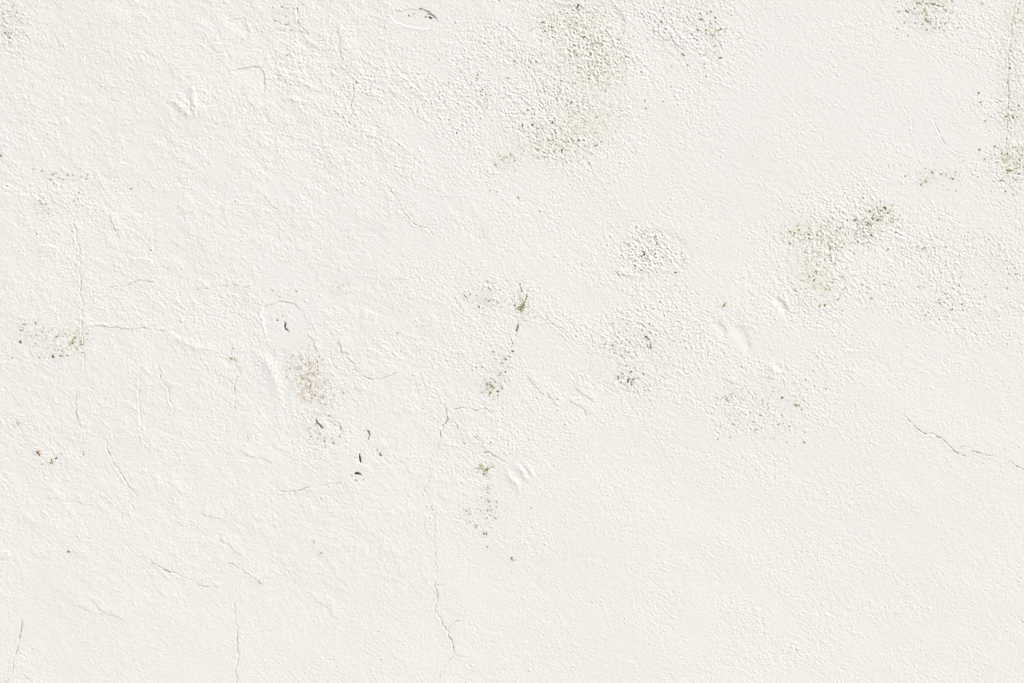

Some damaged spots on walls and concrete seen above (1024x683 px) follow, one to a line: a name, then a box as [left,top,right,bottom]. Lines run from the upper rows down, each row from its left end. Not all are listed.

damp [660,0,740,65]
damp [460,0,649,171]
damp [780,196,1024,325]
damp [7,314,89,361]
damp [475,342,519,400]
crack [438,404,498,458]
damp [460,463,500,548]